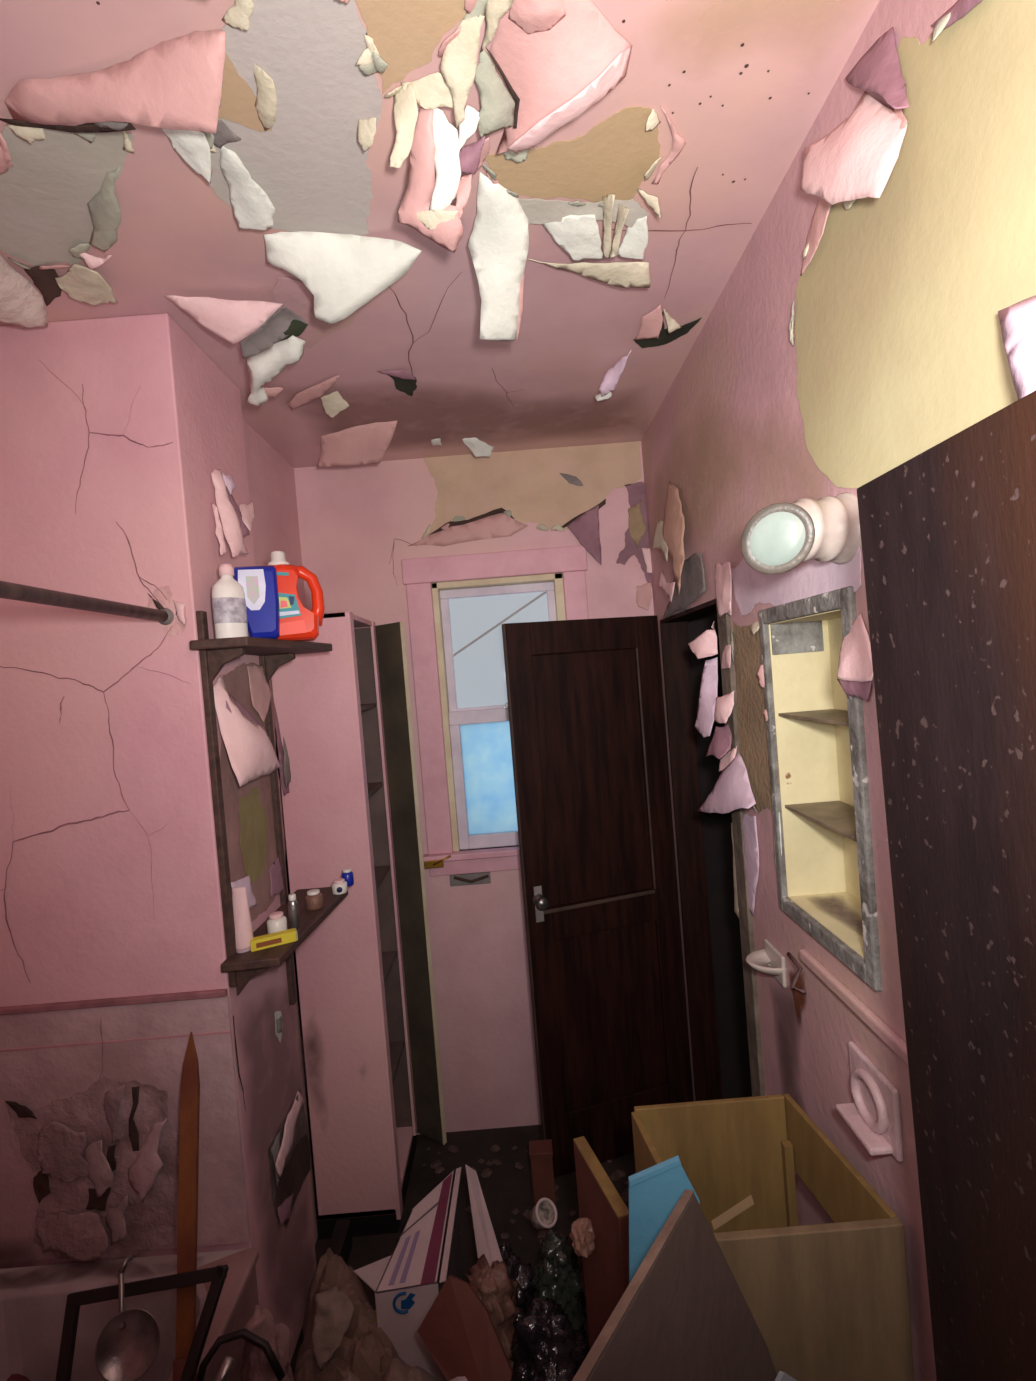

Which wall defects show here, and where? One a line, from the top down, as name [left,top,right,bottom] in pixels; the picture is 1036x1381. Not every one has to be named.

crack [38,359,173,514]
peeling [211,469,255,557]
peeling [0,0,686,467]
crack [389,272,462,376]
peeling [789,0,1036,488]
crack [0,522,188,983]
peeling [213,662,291,922]
peeling [409,437,861,918]
flaking render [5,1076,179,1262]
spalling [268,1088,311,1229]